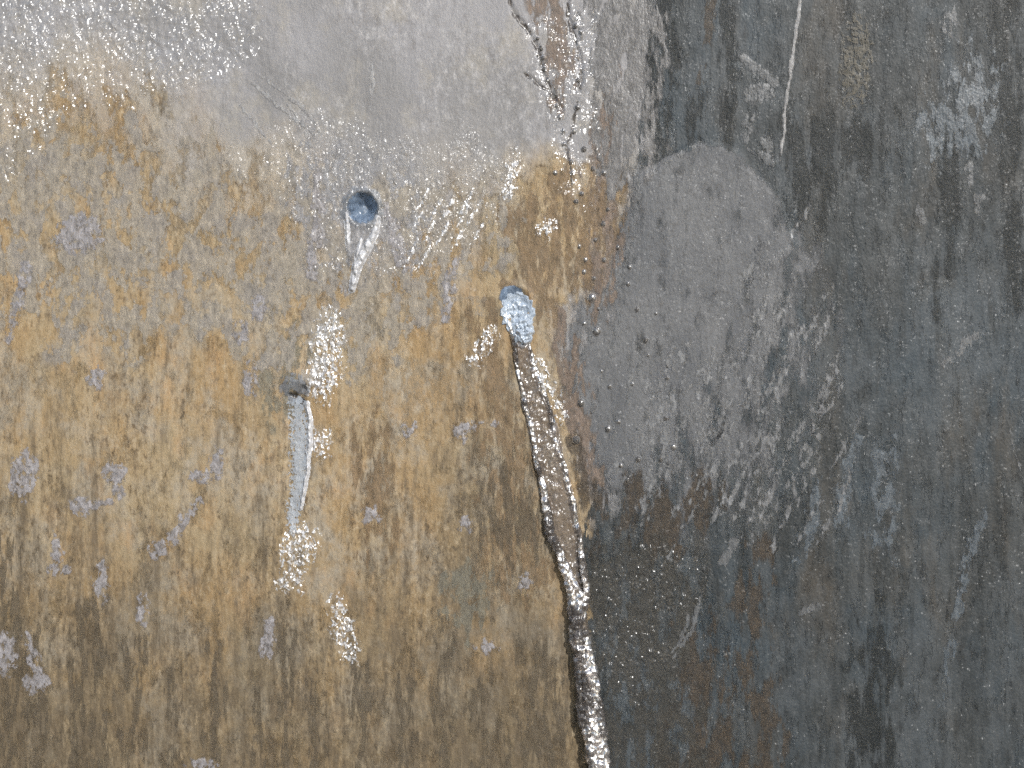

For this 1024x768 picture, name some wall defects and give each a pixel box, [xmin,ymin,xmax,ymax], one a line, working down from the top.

crack [508,0,583,185]
water stain [0,75,525,406]
rust [0,67,725,768]
water stain [349,405,403,568]
water stain [200,640,228,768]
water stain [243,623,328,768]
water stain [327,593,372,768]
water stain [395,673,417,768]
water stain [429,618,494,768]